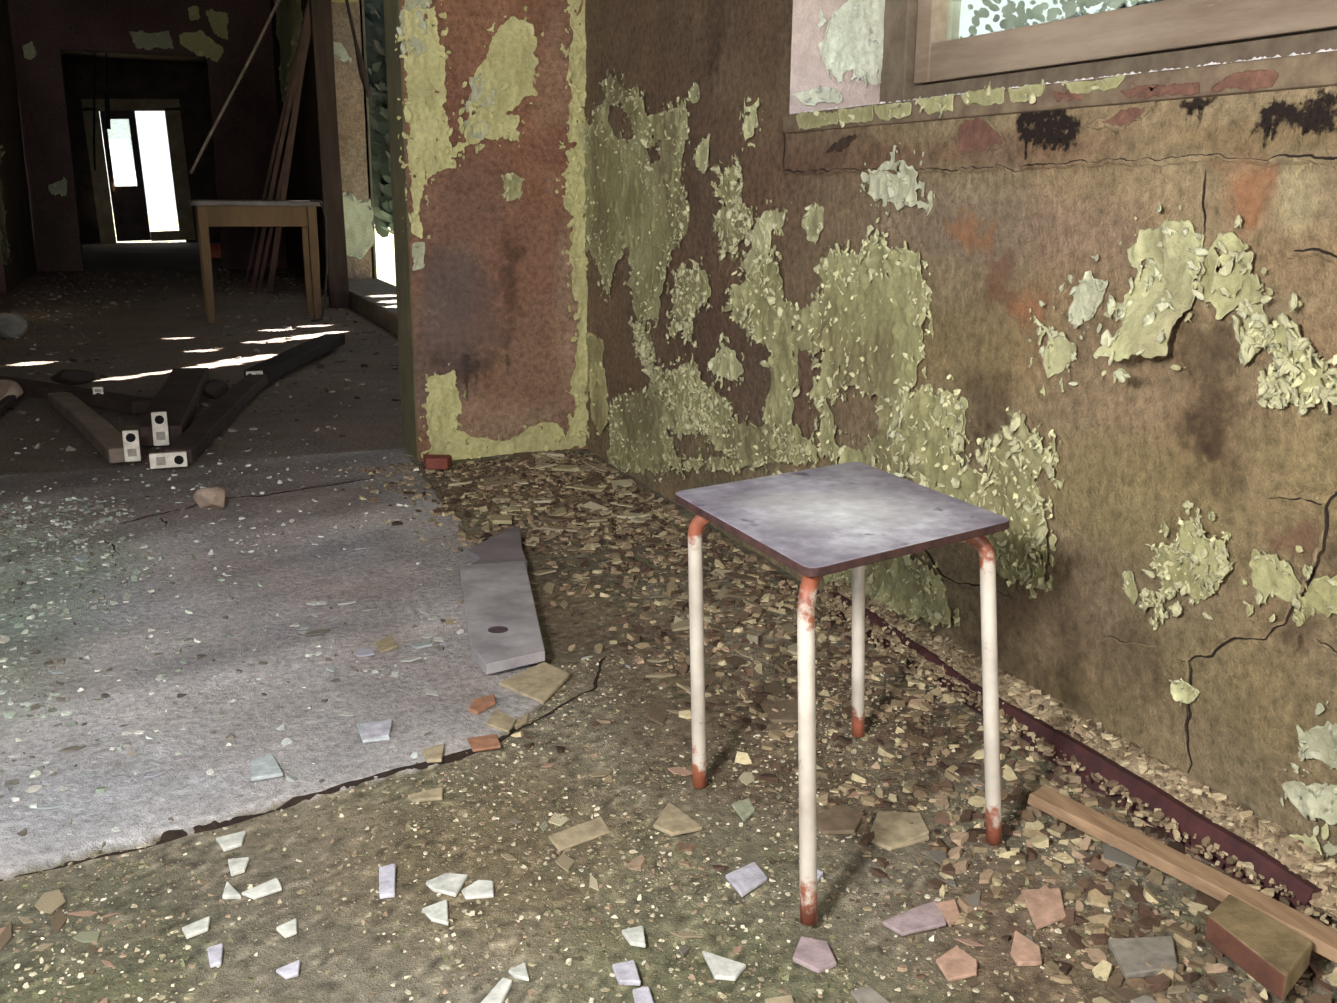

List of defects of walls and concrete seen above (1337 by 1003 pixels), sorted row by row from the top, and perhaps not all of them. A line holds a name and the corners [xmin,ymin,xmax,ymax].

peeling [394,0,544,271]
peeling [419,0,1064,599]
peeling [792,0,1279,155]
mould [1016,109,1080,160]
crack [781,127,1337,234]
peeling [1028,202,1337,415]
damp [1180,96,1215,124]
mould [1249,88,1337,148]
crack [1287,248,1337,265]
crack [1096,484,1337,773]
peeling [1122,499,1337,630]
peeling [1280,700,1337,860]